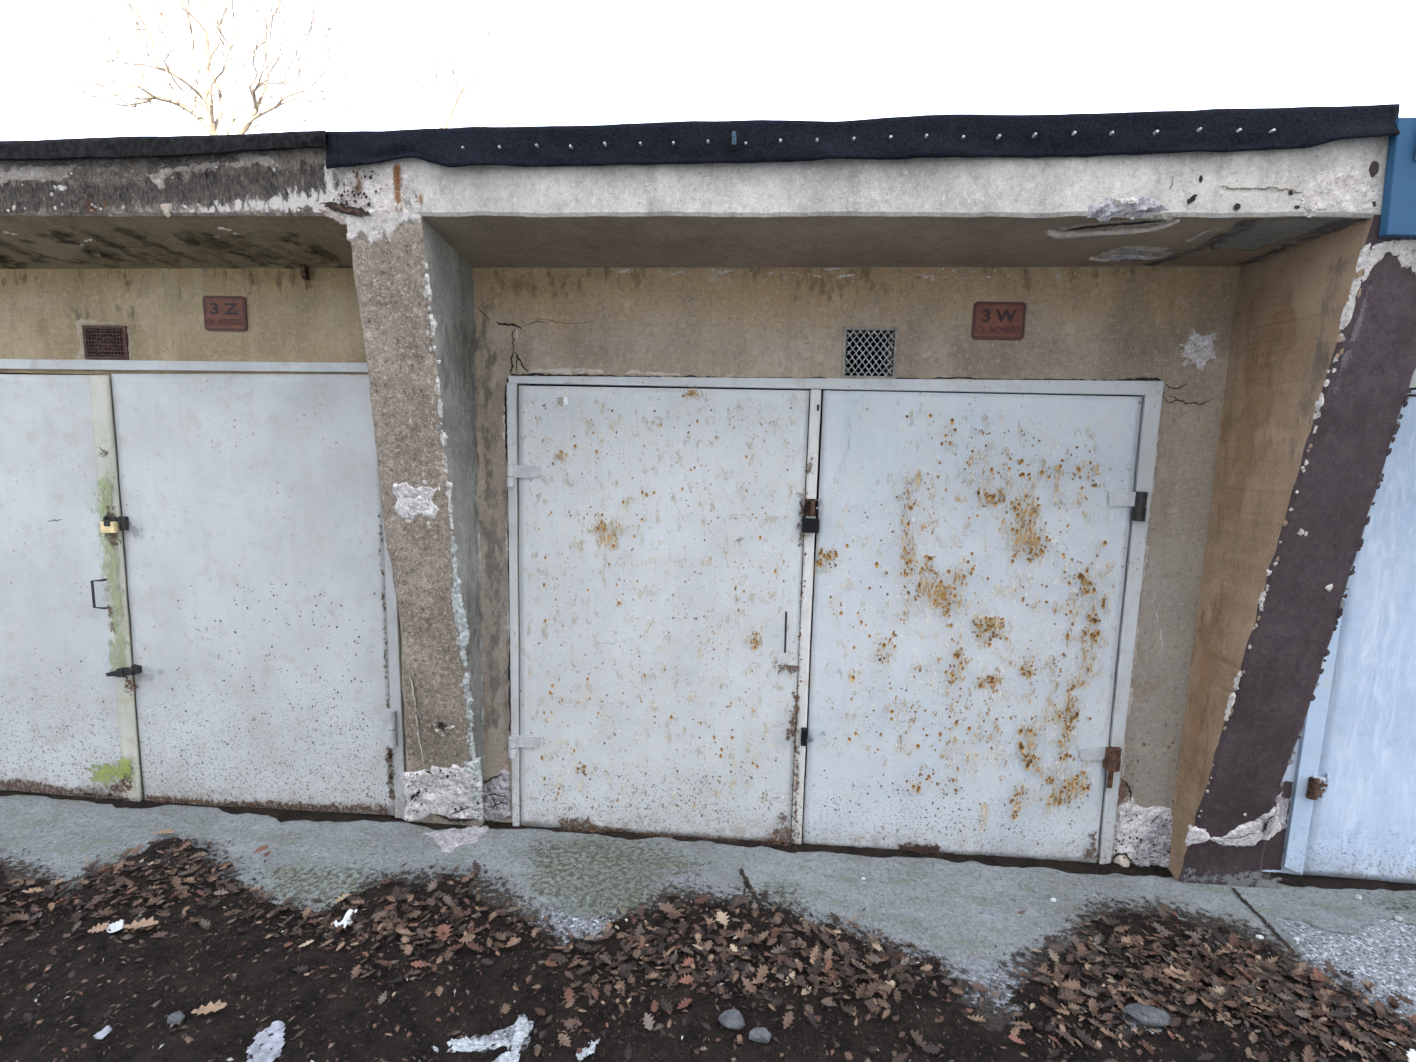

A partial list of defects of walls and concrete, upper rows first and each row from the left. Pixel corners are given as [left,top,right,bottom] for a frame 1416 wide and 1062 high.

water stain [0,183,349,349]
water stain [177,160,339,213]
spalling [1046,195,1180,262]
rust [651,390,734,447]
spalling [1301,238,1416,473]
rust [378,514,389,708]
flaking render [392,262,512,852]
spalling [1248,490,1308,649]
spalling [1325,388,1412,631]
rust [0,746,395,815]
rust [897,841,943,855]
flaking render [1111,611,1289,867]